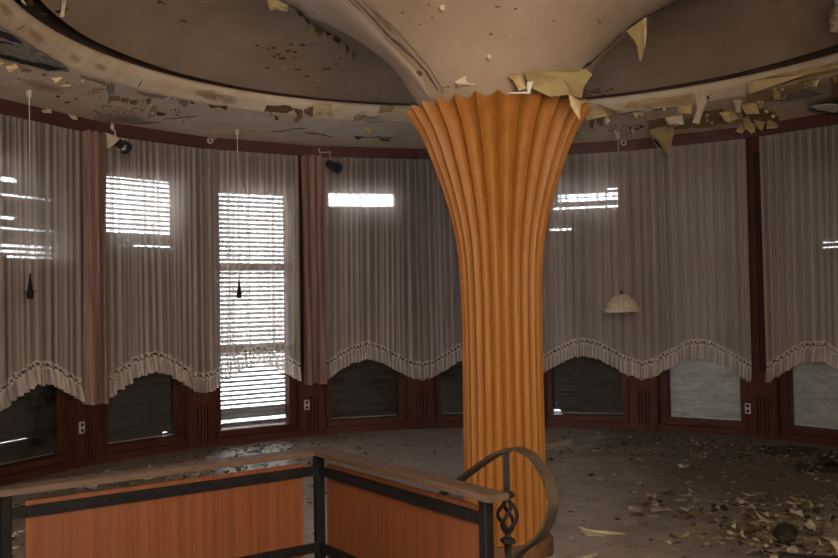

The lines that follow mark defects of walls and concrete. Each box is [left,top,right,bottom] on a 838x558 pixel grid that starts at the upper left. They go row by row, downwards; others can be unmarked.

flaking render [0,26,196,151]
peeling [507,61,838,154]